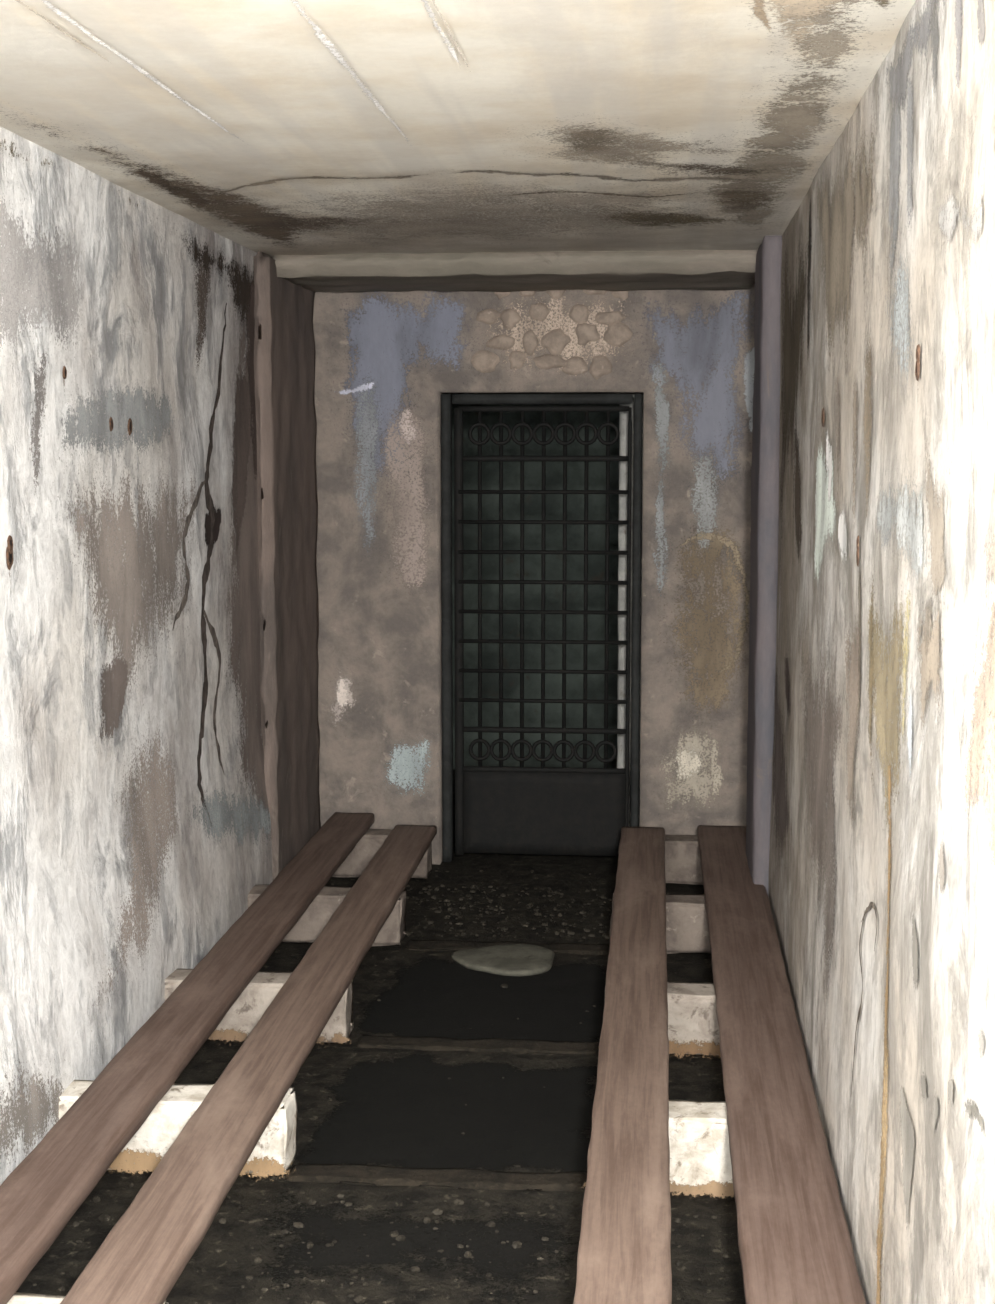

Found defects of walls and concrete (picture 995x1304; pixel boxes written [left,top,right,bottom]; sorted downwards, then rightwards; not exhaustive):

damp [0,193,203,744]
damp [129,0,985,998]
crack [851,902,877,1090]
corrosion [856,535,912,1304]